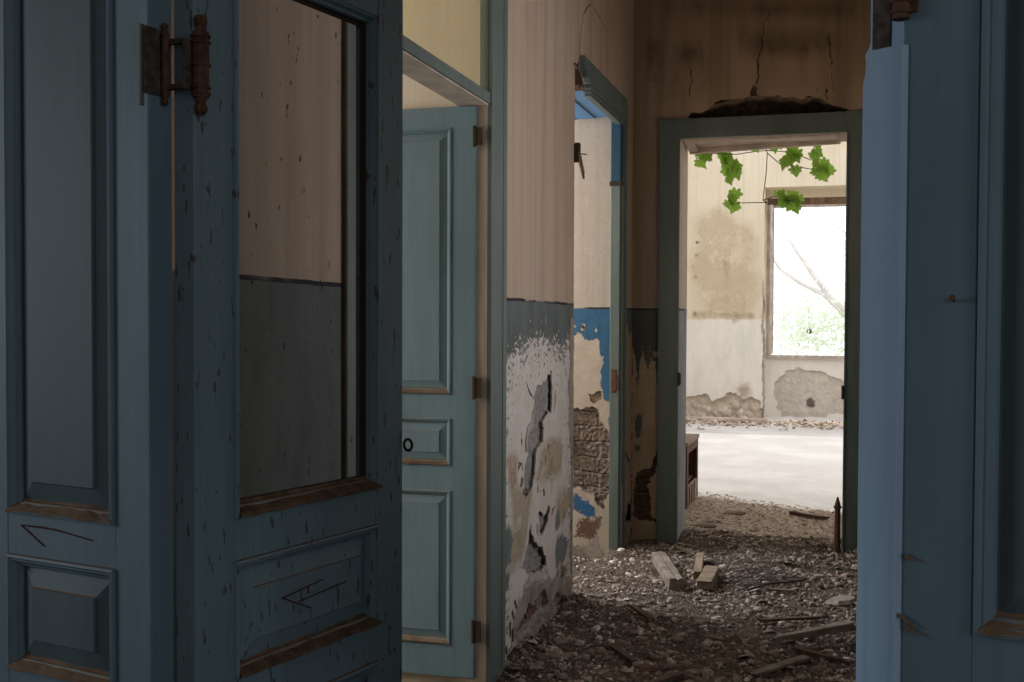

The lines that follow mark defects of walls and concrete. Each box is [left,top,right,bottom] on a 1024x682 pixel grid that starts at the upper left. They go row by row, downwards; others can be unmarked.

crack [755,4,779,85]
spalling [687,85,848,118]
peeling [625,323,658,546]
spalling [686,392,764,418]
spalling [773,367,844,418]
peeling [500,318,610,675]